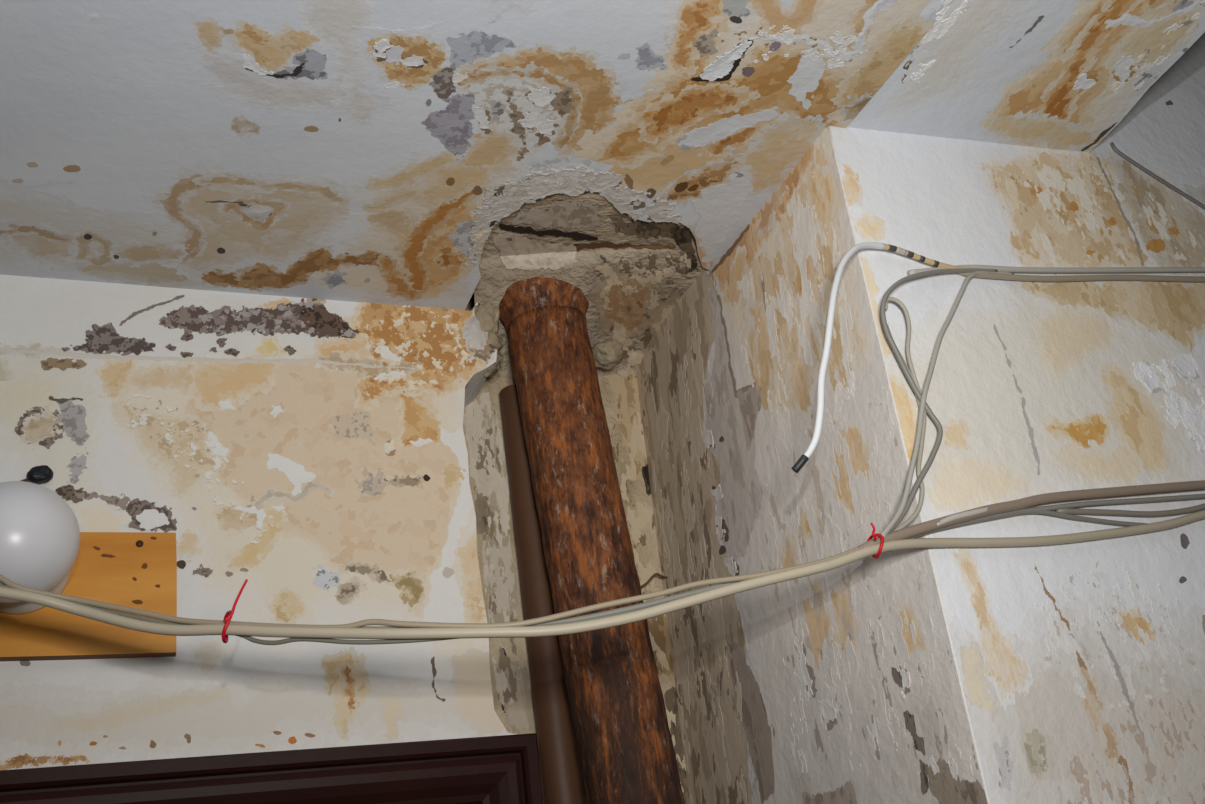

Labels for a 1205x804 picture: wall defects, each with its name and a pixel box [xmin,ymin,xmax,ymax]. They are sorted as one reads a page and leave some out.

water stain [188,0,396,138]
peeling [693,0,867,110]
spalling [901,0,968,83]
peeling [321,271,370,289]
peeling [14,400,177,533]
peeling [40,301,473,393]
water stain [0,125,529,645]
spalling [372,30,987,804]
water stain [453,0,1205,804]
water stain [0,638,536,766]